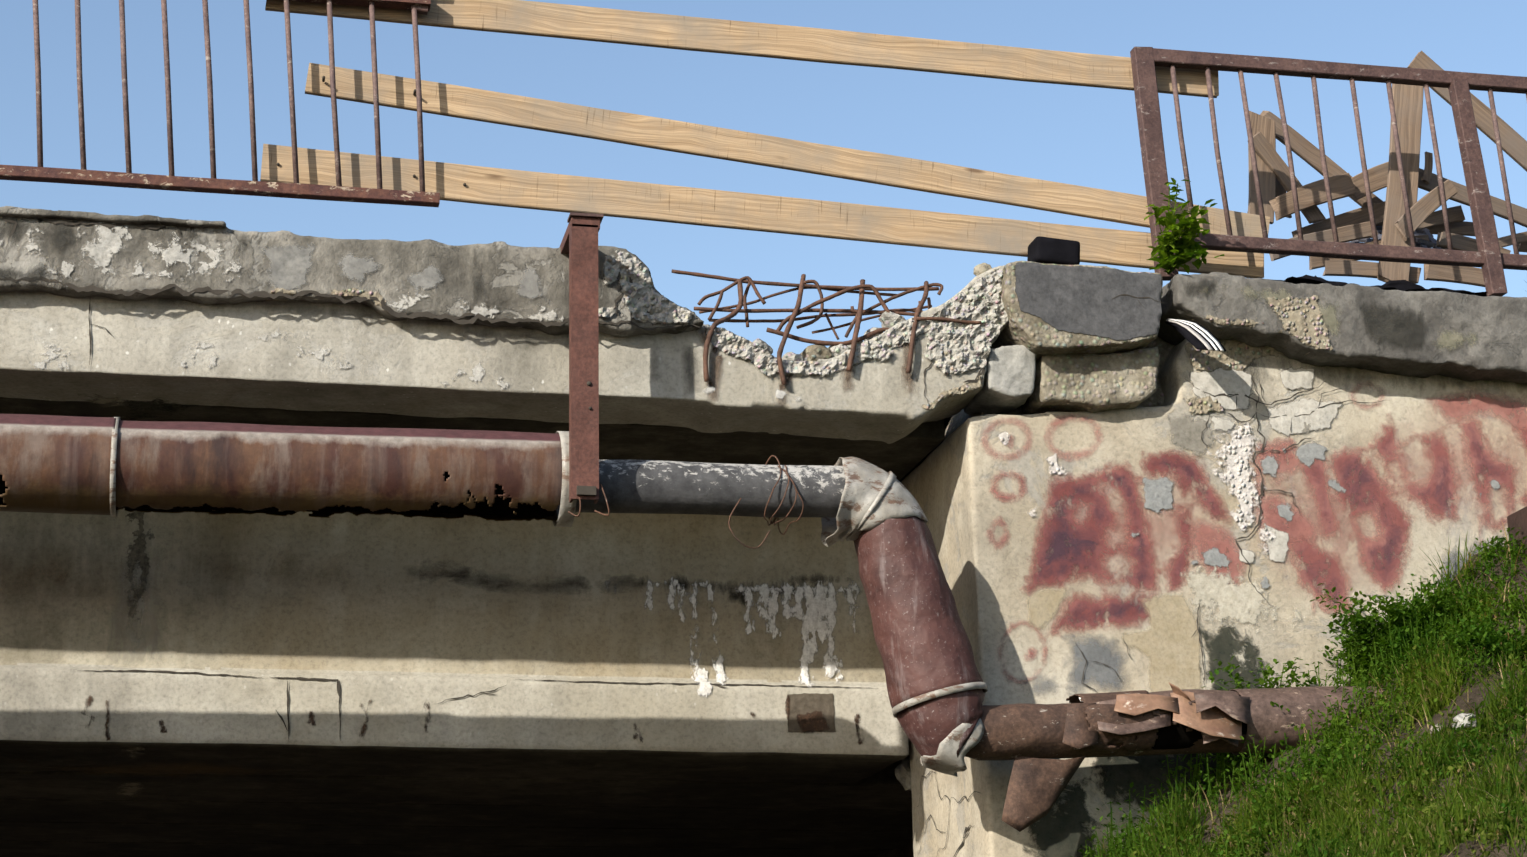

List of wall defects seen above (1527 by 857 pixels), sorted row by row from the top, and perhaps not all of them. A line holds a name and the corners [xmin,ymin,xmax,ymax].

peeling [0,227,43,255]
peeling [47,222,241,287]
peeling [263,244,315,301]
peeling [331,253,443,313]
peeling [453,269,564,328]
spalling [598,251,1009,411]
peeling [1123,295,1343,692]
peeling [1328,479,1346,493]
leakage [606,576,860,698]
peeling [1029,589,1066,628]
crack [438,679,876,704]
crack [917,771,980,856]